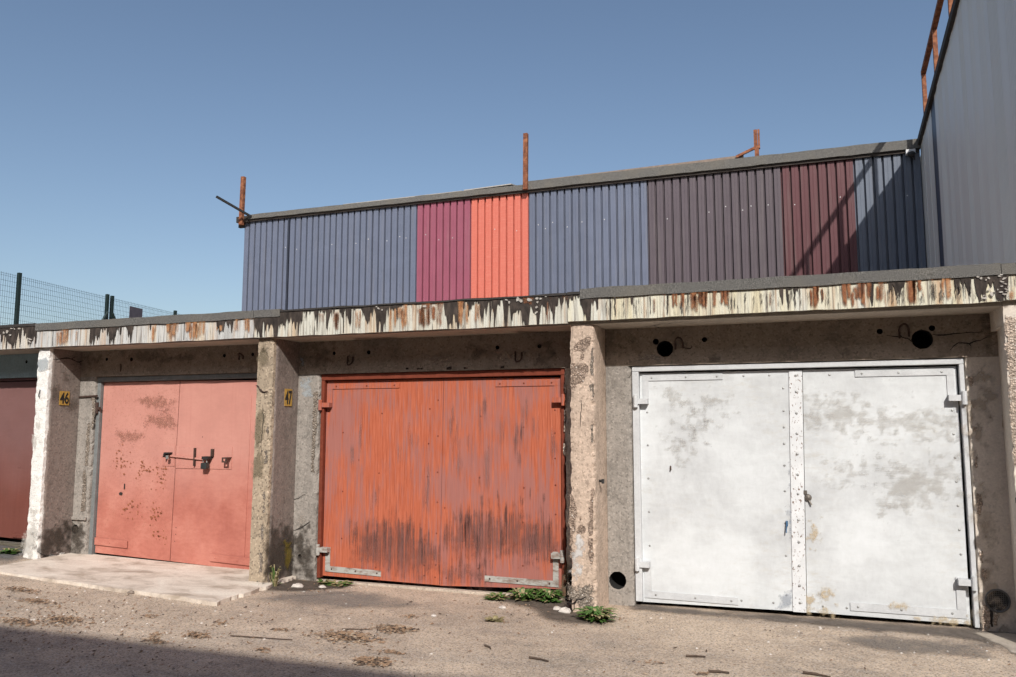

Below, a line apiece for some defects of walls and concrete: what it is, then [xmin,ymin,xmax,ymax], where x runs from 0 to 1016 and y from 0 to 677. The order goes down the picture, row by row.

rust [653,291,729,310]
rust [810,286,824,306]
rust [842,282,883,306]
rust [907,278,951,304]
rust [390,305,407,327]
rust [419,302,443,326]
rust [458,301,479,324]
rust [152,321,204,341]